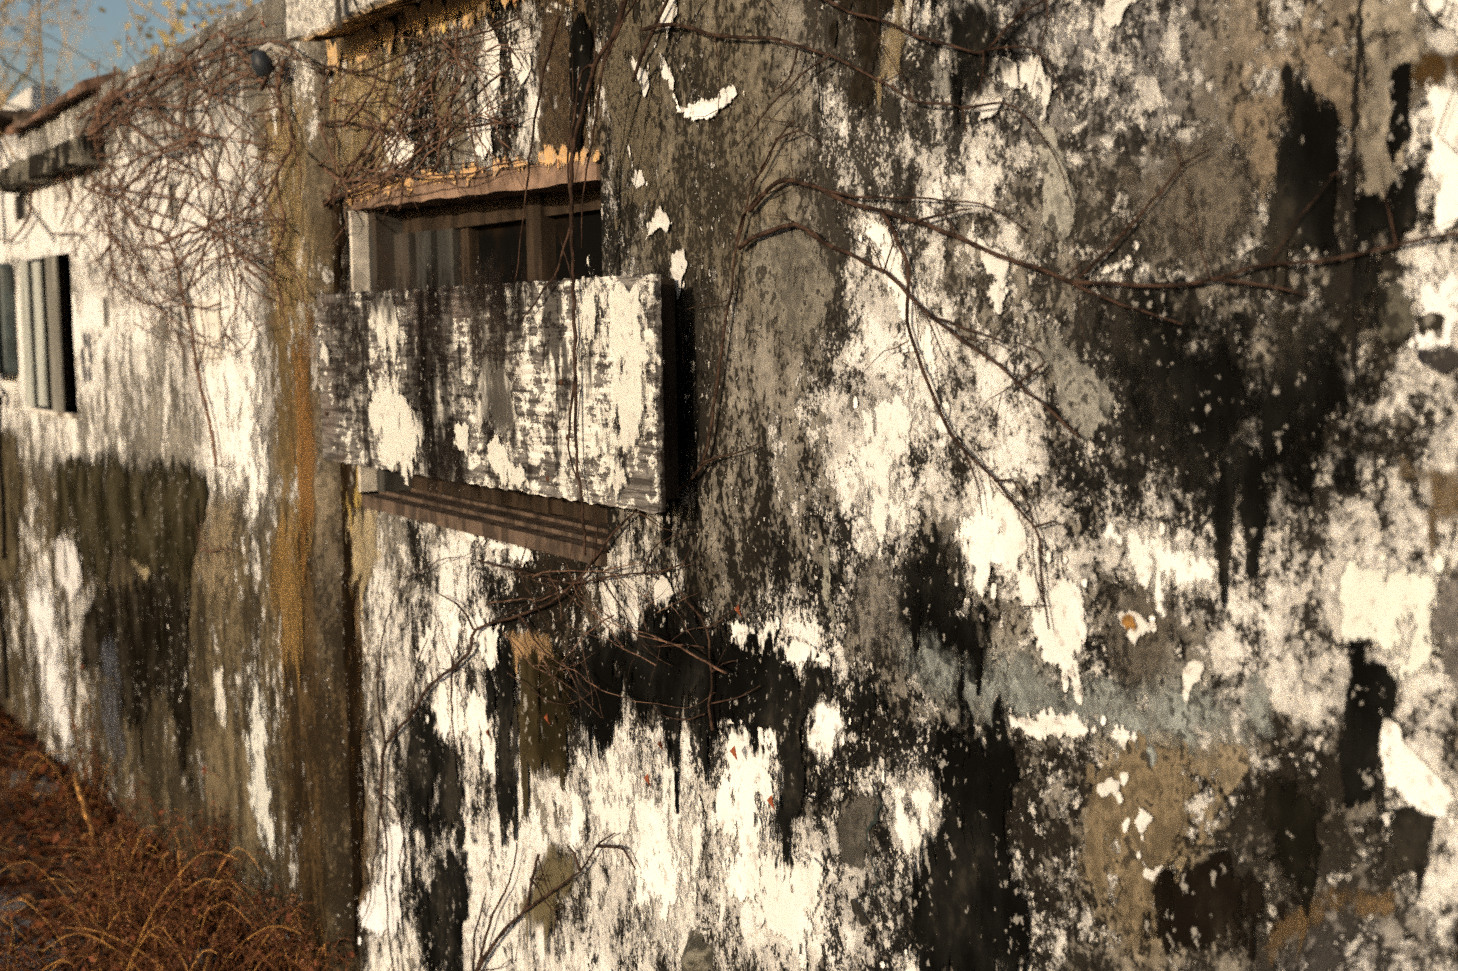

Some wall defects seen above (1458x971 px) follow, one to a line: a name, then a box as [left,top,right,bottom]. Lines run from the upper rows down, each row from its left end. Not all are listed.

spalling [326,0,744,240]
spalling [1292,0,1458,234]
damp [1092,48,1458,613]
damp [53,445,214,795]
peeling [357,816,409,945]
damp [269,198,523,971]
peeling [414,602,504,780]
damp [483,596,898,881]
peeling [556,705,944,971]
damp [895,529,1042,971]
damp [1141,637,1437,963]
peeling [1378,709,1456,845]